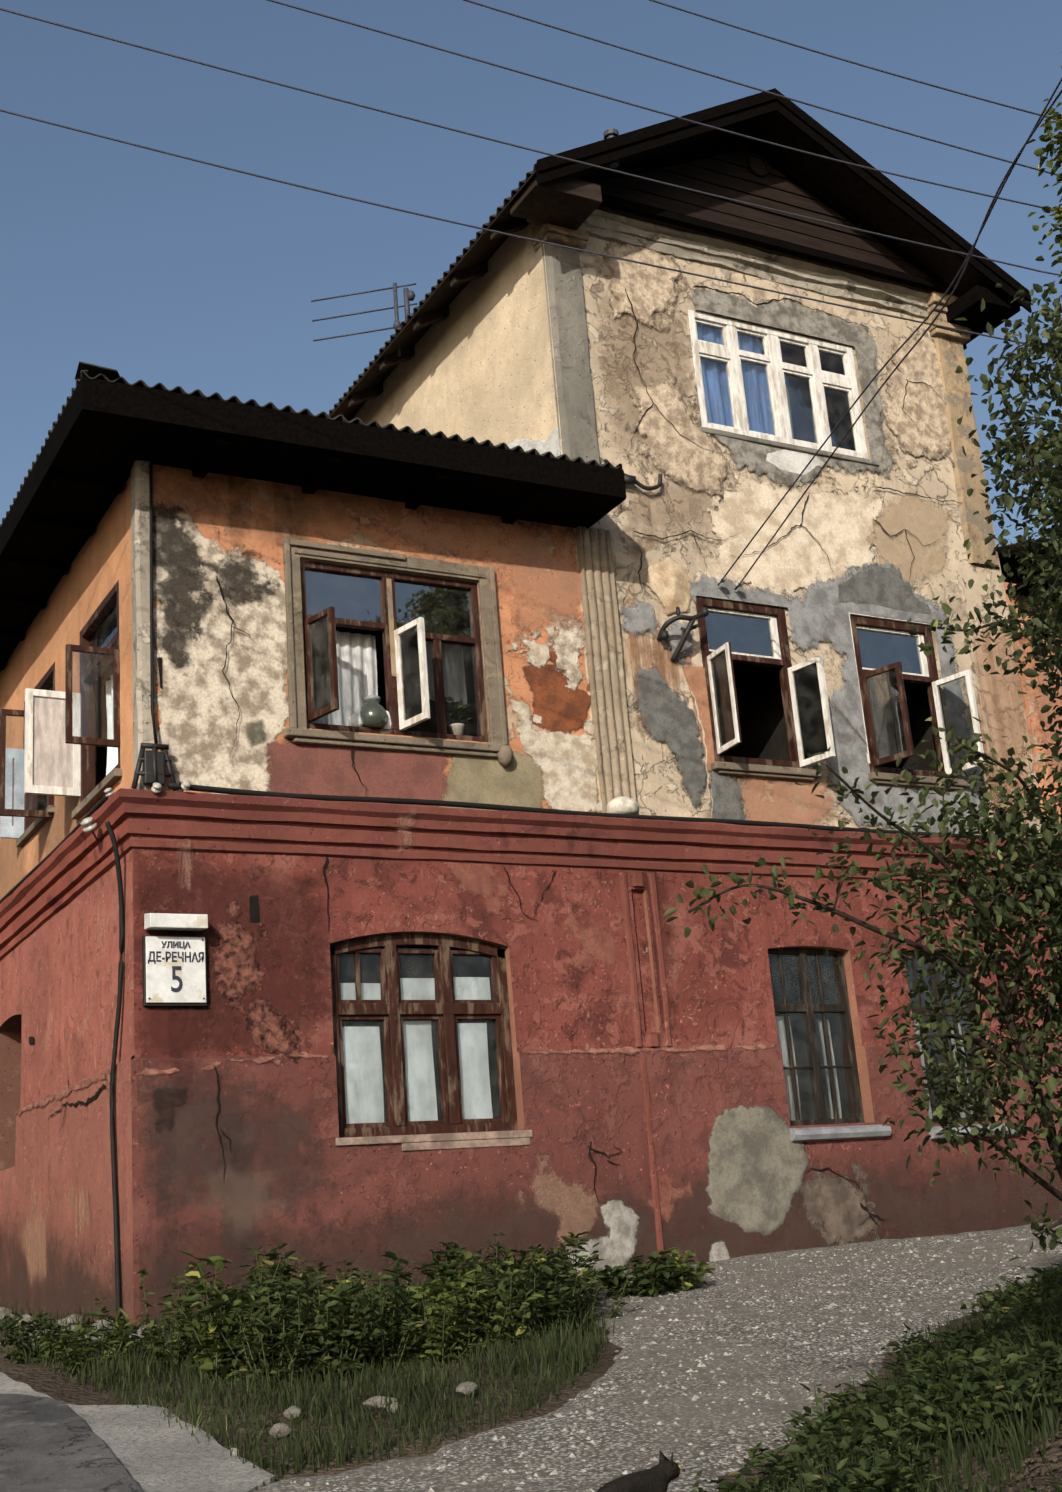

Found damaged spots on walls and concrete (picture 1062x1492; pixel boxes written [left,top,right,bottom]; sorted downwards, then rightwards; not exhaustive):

crack [694,285,868,328]
crack [625,289,714,453]
crack [891,359,944,429]
crack [634,495,834,591]
crack [872,487,959,582]
peeling [153,512,289,794]
peeling [345,505,602,812]
peeling [677,650,715,784]
peeling [741,777,833,826]
crack [48,1084,105,1125]
spalling [800,1163,880,1247]